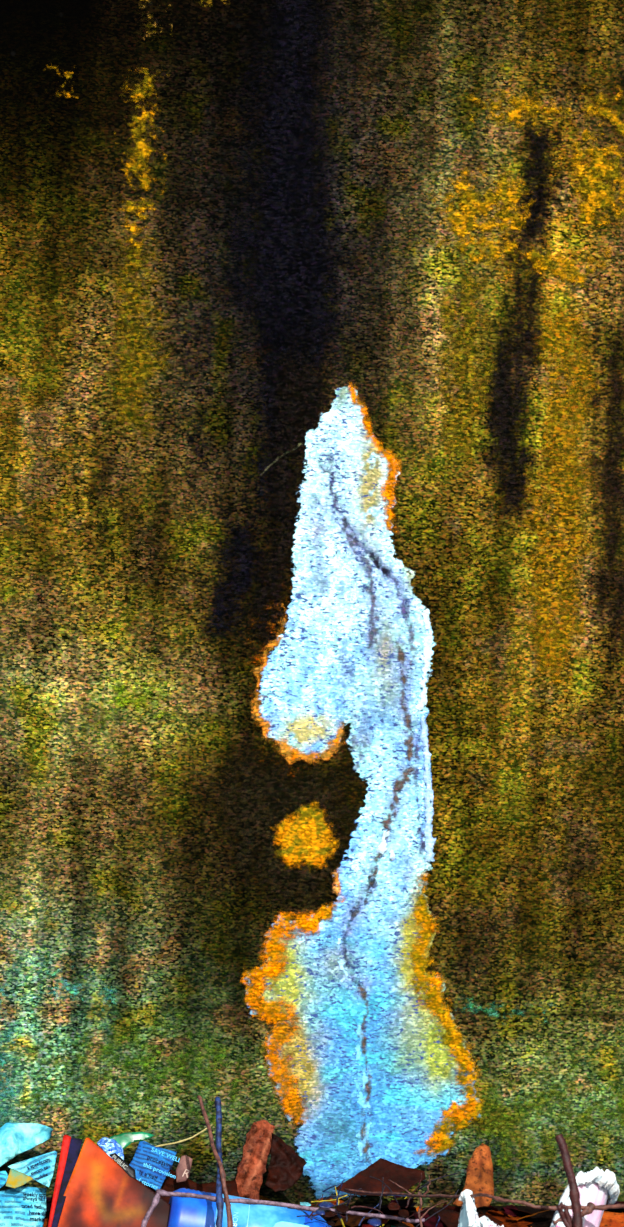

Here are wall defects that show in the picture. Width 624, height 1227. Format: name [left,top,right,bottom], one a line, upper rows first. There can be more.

water stain [481,122,561,513]
corrosion [242,803,345,1123]
crack [262,443,426,1161]